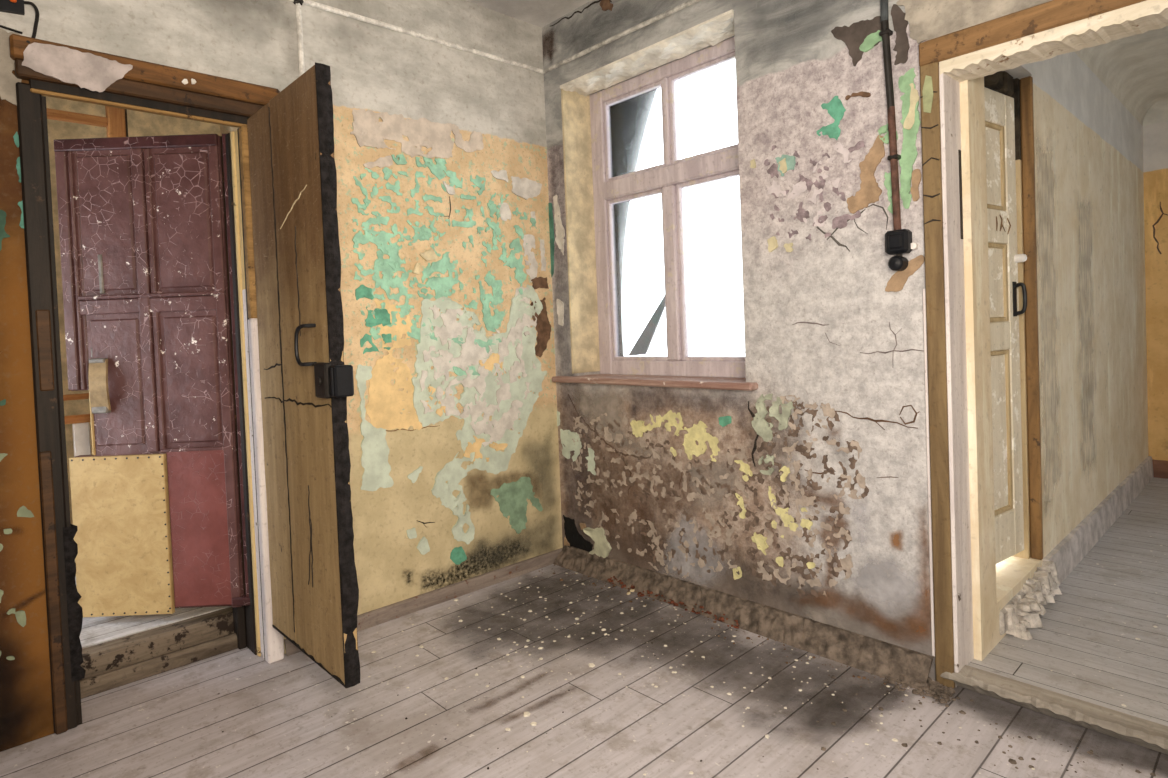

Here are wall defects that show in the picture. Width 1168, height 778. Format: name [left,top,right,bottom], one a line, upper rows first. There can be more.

peeling [0,29,133,106]
flaking render [750,0,1052,252]
crack [1152,202,1167,254]
spalling [885,255,925,292]
peeling [350,109,565,565]
crack [792,322,923,361]
crack [836,405,919,430]
peeling [557,393,869,599]
water stain [407,534,550,590]
water stain [668,521,718,581]
peeling [0,589,26,627]
water stain [461,576,898,727]